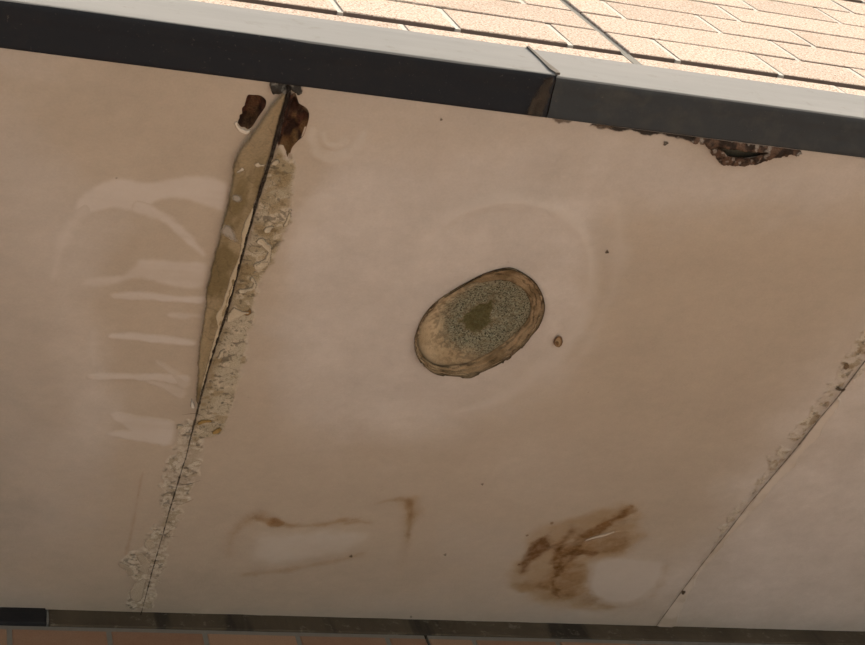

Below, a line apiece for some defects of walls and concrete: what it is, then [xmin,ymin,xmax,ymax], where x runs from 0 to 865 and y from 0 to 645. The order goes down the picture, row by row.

damp [46,173,231,321]
damp [83,325,199,400]
crack [140,85,291,615]
peeling [177,93,309,443]
corrosion [585,554,670,605]
spalling [591,124,802,167]
crack [656,361,865,626]
peeling [695,327,865,562]